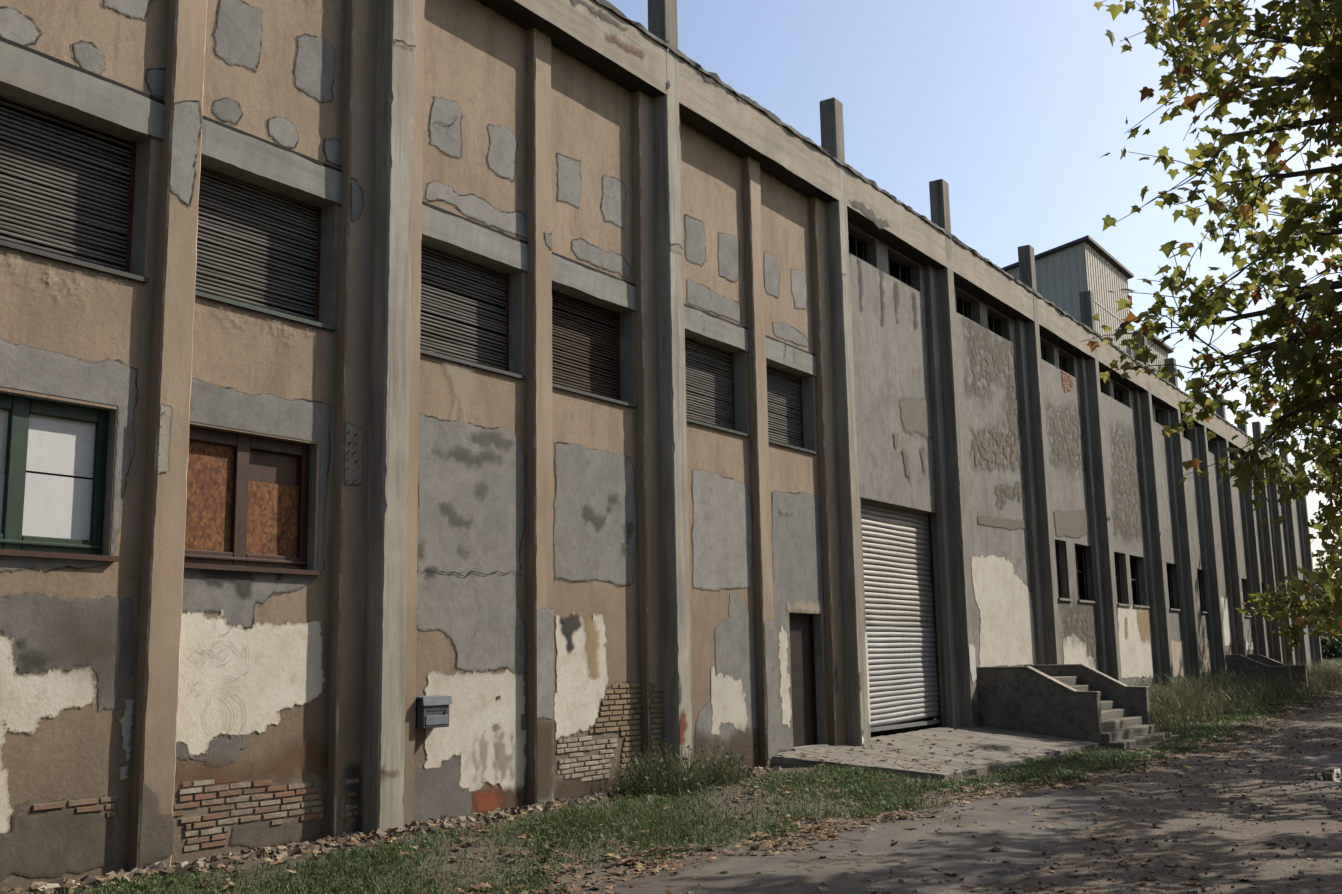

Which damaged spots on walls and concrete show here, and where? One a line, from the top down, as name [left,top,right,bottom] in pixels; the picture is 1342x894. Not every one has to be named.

flaking render [0,635,135,833]
flaking render [176,609,326,758]
flaking render [424,668,528,793]
flaking render [554,611,642,783]
flaking render [711,666,748,736]
flaking render [969,554,1037,682]
flaking render [1118,605,1154,679]
flaking render [173,773,359,852]